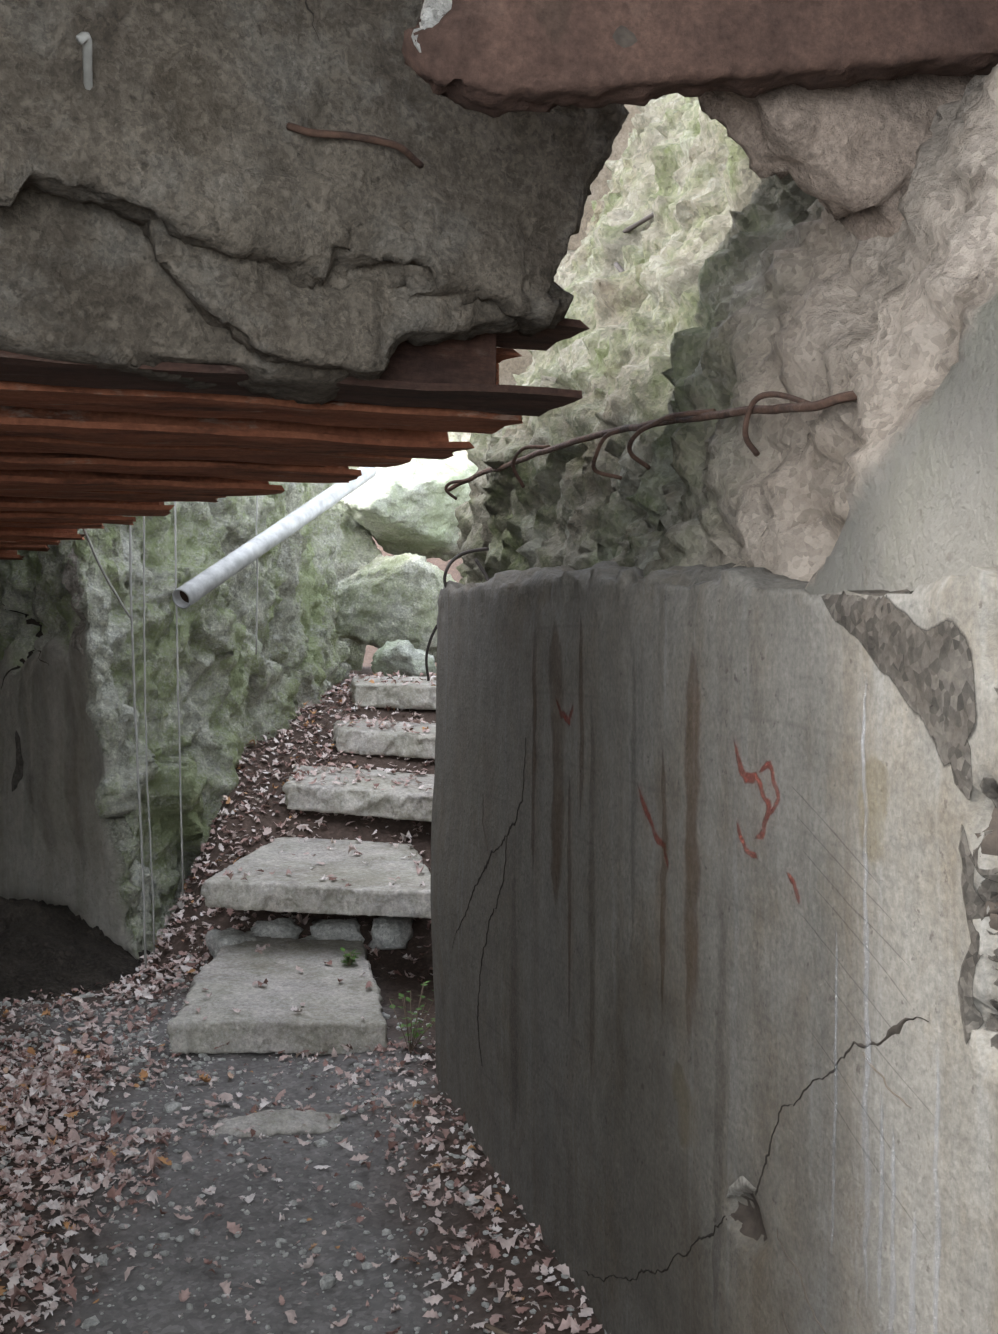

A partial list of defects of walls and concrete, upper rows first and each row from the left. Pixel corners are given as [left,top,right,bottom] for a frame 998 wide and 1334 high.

spalling [411,0,452,53]
crack [452,738,526,1063]
peeling [822,589,998,1050]
crack [583,1017,929,1282]